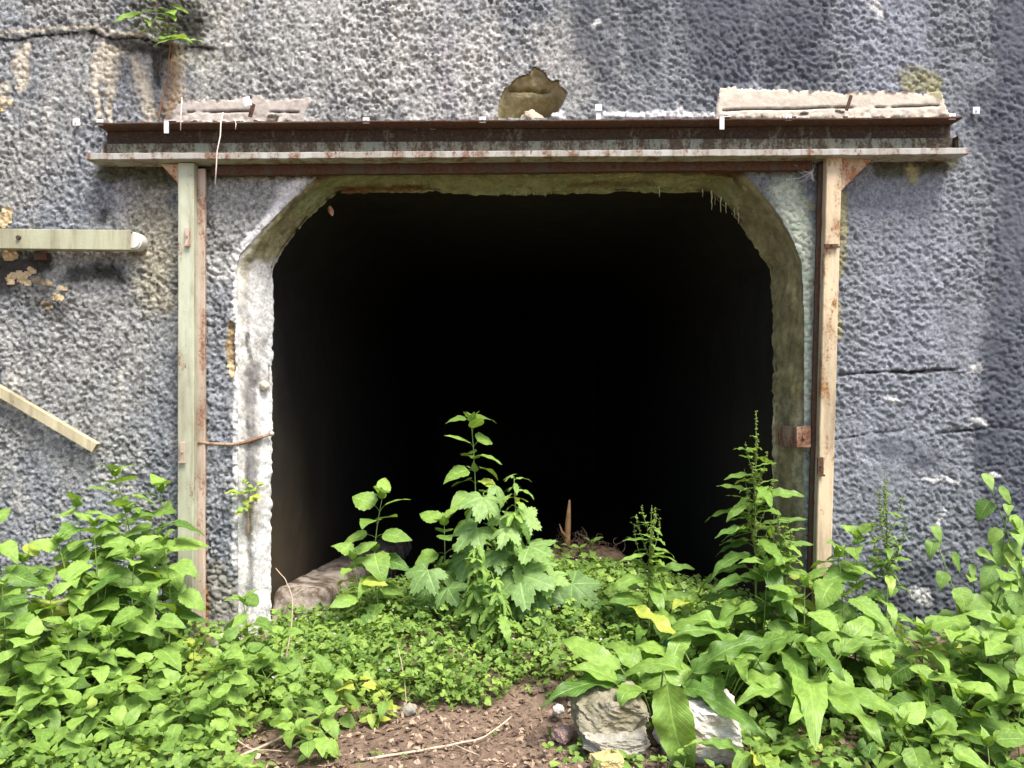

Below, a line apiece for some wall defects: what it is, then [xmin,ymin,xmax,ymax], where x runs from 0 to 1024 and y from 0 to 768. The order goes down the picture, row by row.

crack [0,29,211,66]
spalling [497,66,568,120]
peeling [0,206,13,228]
peeling [2,250,68,310]
spalling [225,322,236,377]
crack [845,368,987,376]
crack [949,426,984,434]